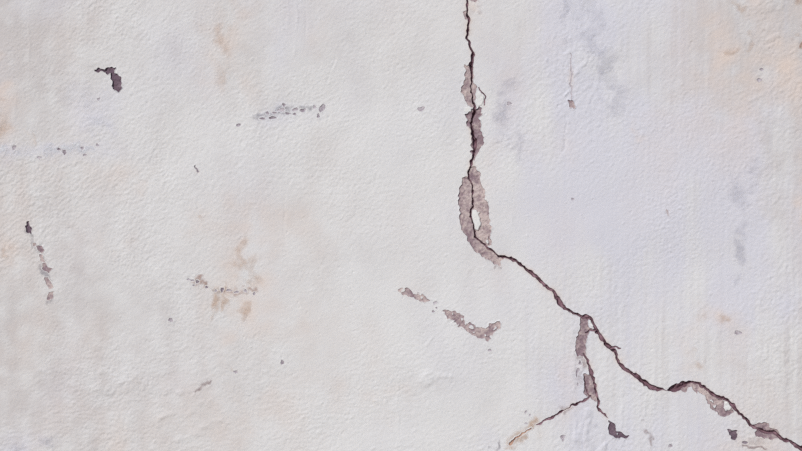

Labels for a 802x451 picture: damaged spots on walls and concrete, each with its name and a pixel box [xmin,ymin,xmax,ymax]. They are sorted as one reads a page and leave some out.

peeling [94,67,122,92]
flaking render [458,65,503,266]
peeling [25,221,54,300]
crack [465,0,802,451]
peeling [398,288,501,352]